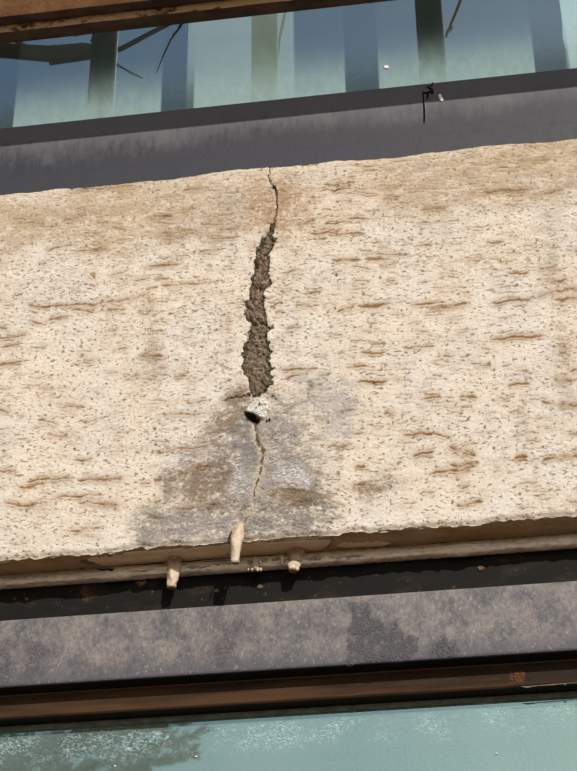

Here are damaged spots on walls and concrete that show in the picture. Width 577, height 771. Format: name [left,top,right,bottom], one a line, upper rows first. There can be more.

crack [224,168,278,401]
damp [80,388,393,590]
crack [235,418,267,527]